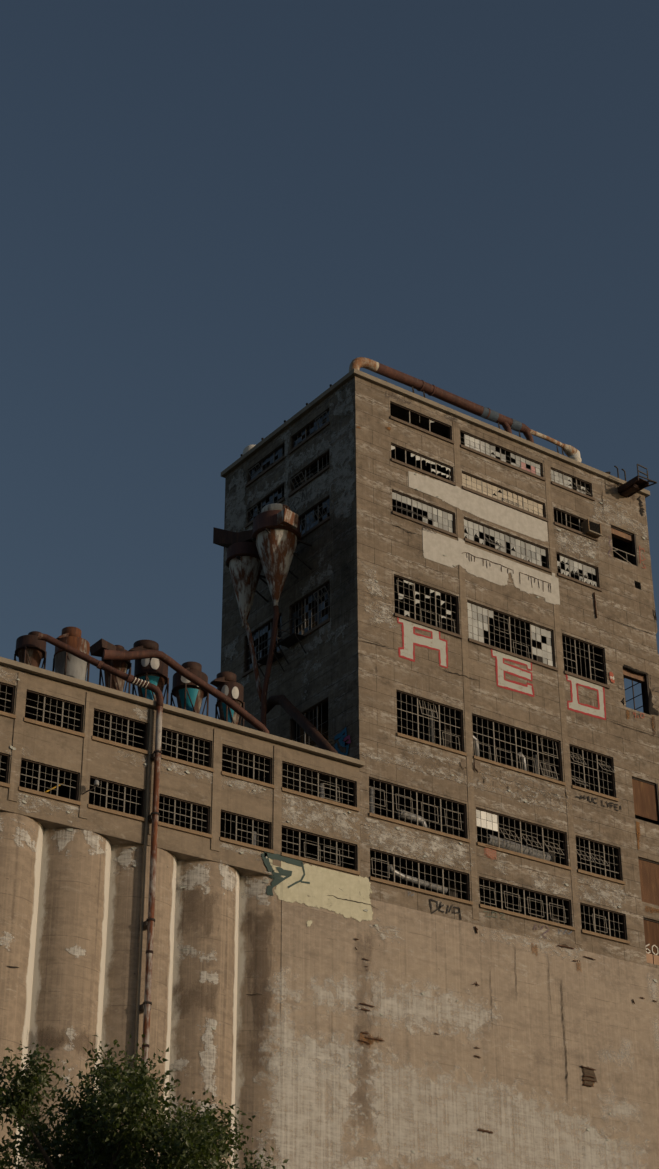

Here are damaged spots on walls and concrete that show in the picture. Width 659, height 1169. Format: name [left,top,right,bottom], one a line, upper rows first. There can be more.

peeling [408,471,600,562]
peeling [422,528,560,605]
peeling [179,844,405,941]
peeling [531,872,626,909]
peeling [179,945,219,984]
peeling [474,926,596,962]
peeling [254,938,647,1169]